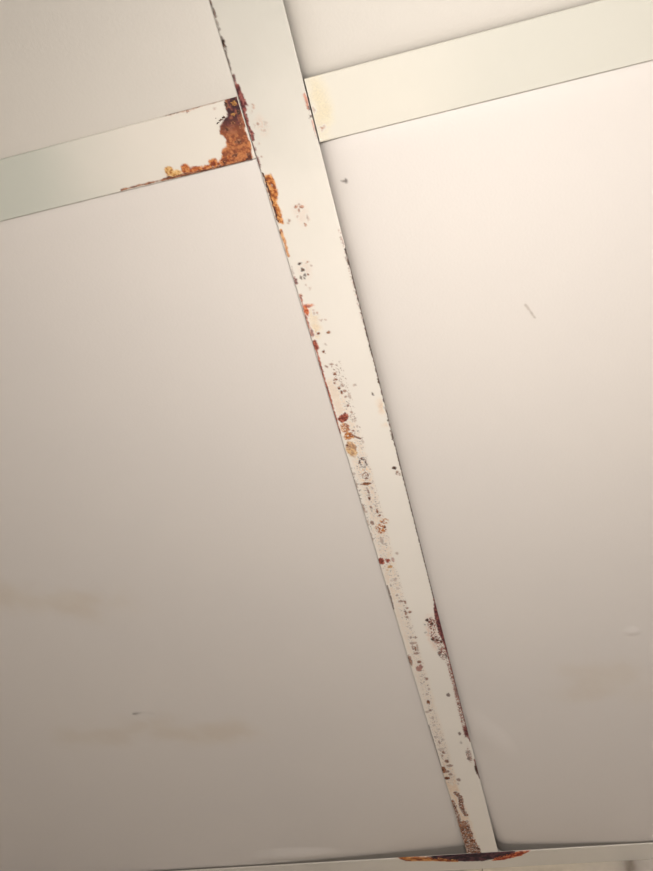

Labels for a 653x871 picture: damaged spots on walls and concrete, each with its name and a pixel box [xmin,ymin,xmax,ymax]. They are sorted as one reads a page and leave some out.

rust [119,0,531,862]